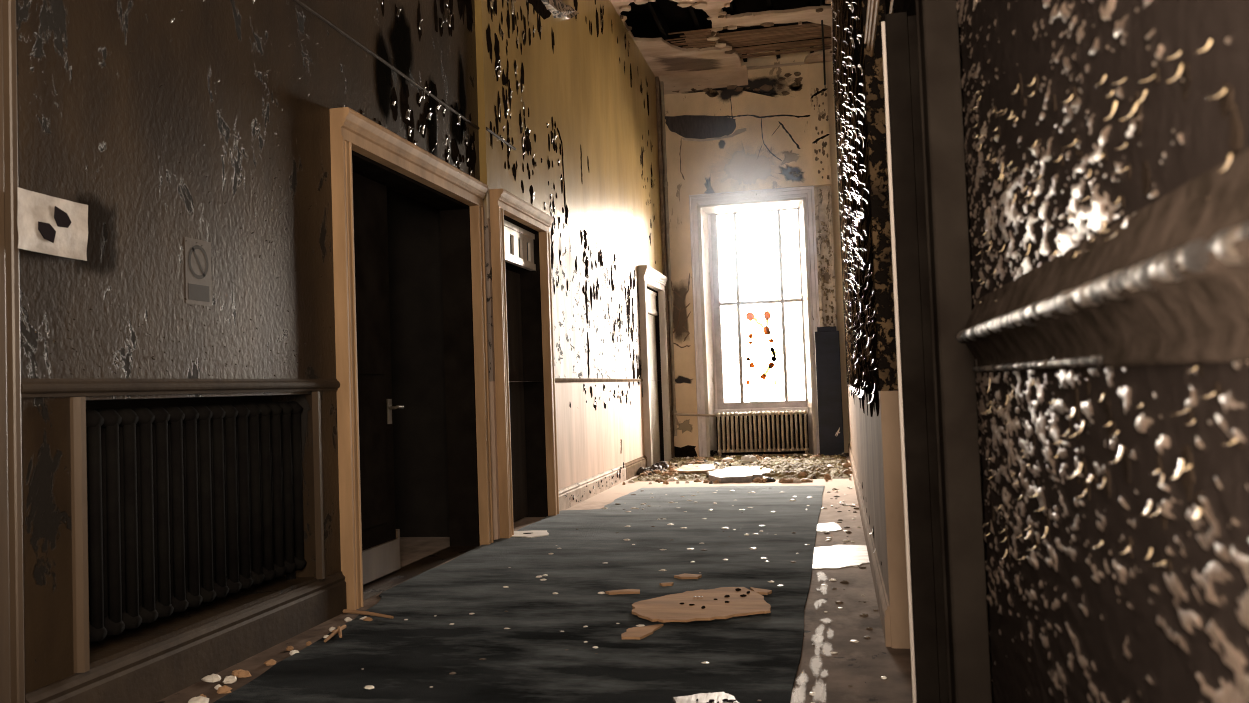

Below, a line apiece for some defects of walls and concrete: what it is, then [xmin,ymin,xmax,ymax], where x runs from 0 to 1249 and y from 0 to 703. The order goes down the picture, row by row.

peeling [360,76,476,177]
crack [725,98,810,161]
flaking render [417,0,656,410]